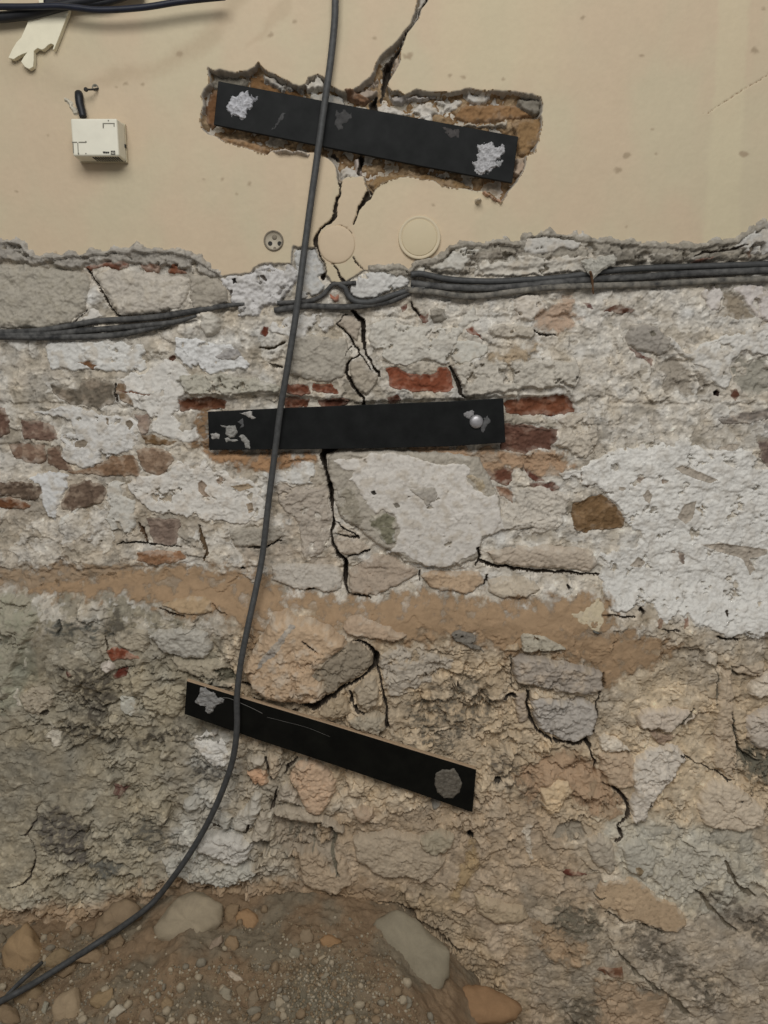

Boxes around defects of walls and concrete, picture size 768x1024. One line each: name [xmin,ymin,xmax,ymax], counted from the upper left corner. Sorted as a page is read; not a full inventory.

flaking render [199,0,543,205]
crack [313,154,373,281]
crack [336,310,381,405]
flaking render [0,218,768,408]
peeling [0,337,369,566]
crack [320,449,371,599]
crack [474,547,600,589]
peeling [485,394,768,640]
crack [294,639,390,728]
flaking render [318,614,454,736]
spalling [451,629,598,742]
crack [495,654,604,766]